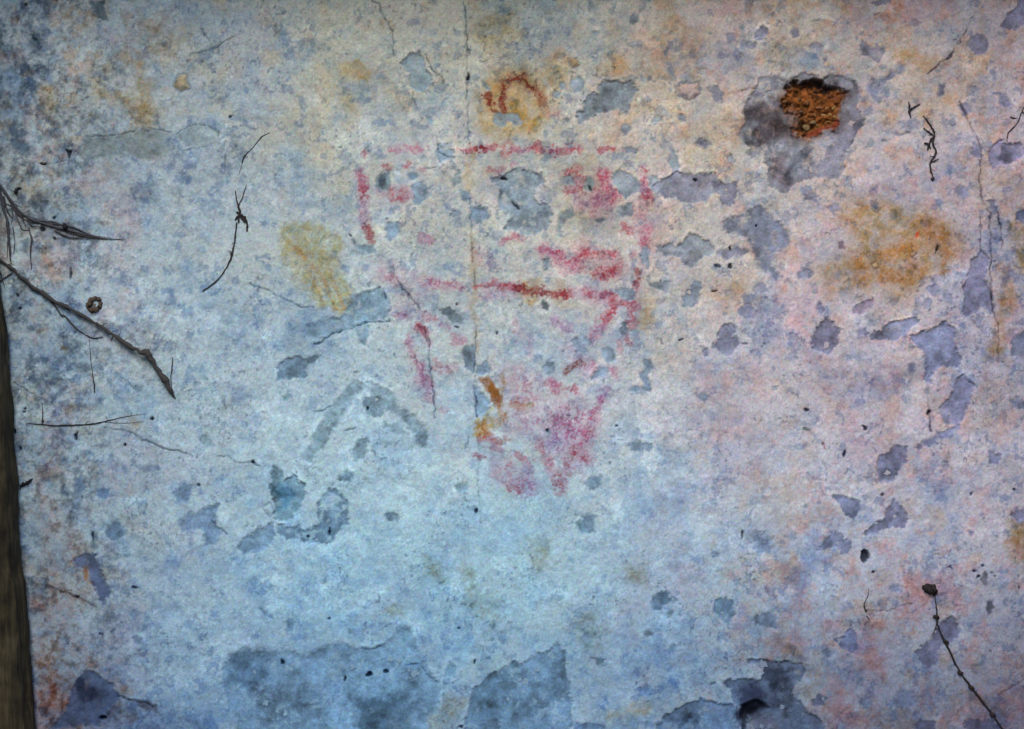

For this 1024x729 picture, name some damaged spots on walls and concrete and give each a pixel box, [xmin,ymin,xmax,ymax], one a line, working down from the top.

rust [766,72,868,155]
peeling [727,27,907,214]
rust [804,186,967,307]
peeling [48,668,122,729]
peeling [222,622,458,729]
peeling [458,641,607,729]
peeling [654,659,829,729]